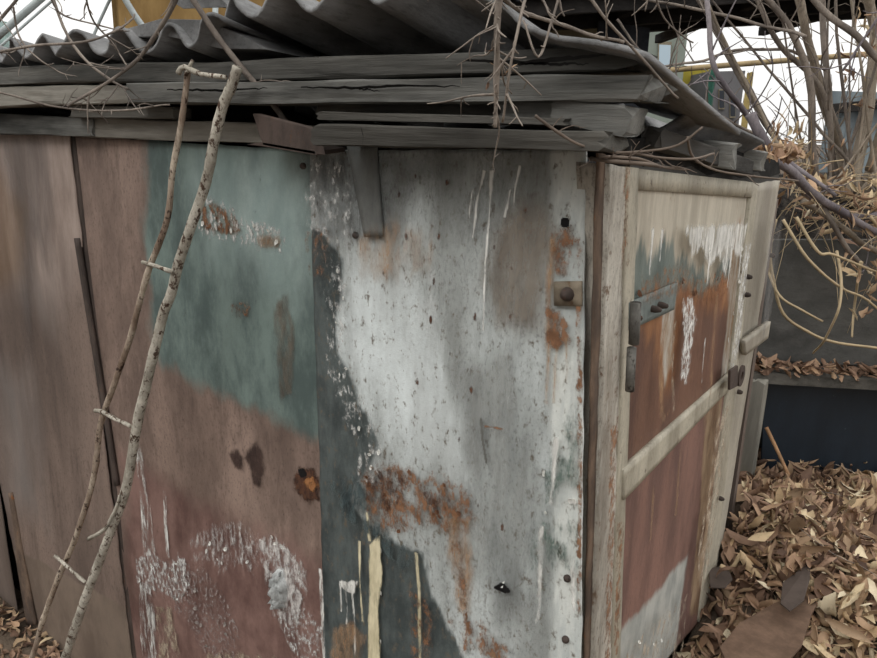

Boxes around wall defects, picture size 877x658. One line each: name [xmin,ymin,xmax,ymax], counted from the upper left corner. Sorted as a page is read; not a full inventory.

crack [301,84,460,92]
crack [465,54,606,66]
rust [545,227,583,559]
peeling [136,501,325,658]
rust [304,476,319,492]
peeling [339,580,358,624]
peeling [328,445,411,571]
rust [359,465,508,658]
rust [698,406,729,590]